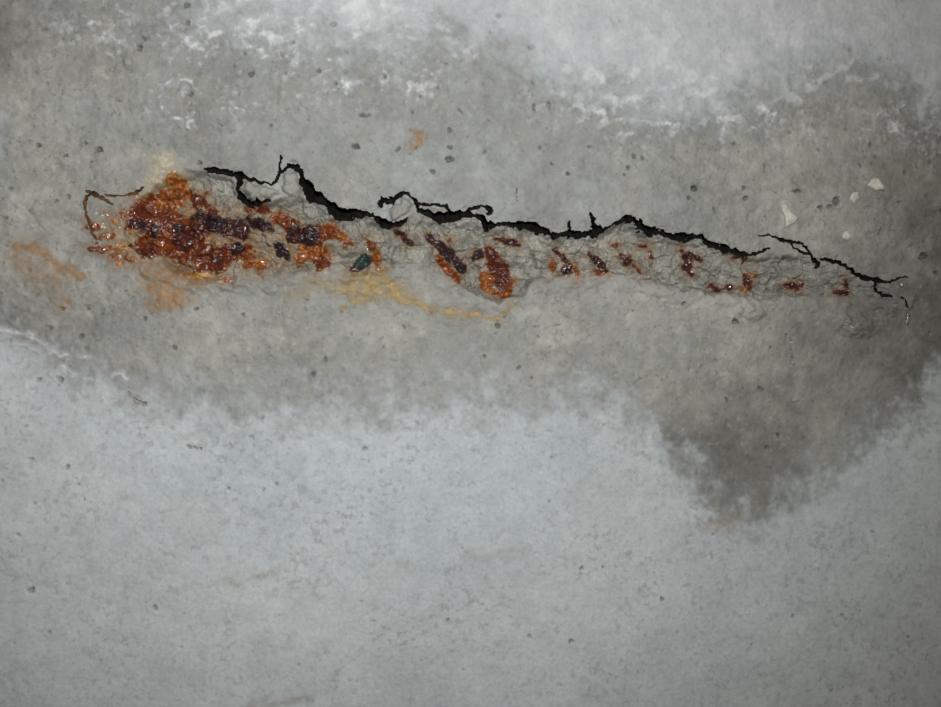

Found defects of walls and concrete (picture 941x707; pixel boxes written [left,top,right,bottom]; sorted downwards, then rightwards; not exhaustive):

rust [85,154,521,321]
crack [204,155,910,308]
water stain [0,0,941,518]
rust [549,248,580,278]
rust [587,251,609,276]
rust [611,242,653,274]
rust [679,249,704,277]
rust [708,255,755,292]
rust [783,281,804,292]
rust [832,278,850,296]